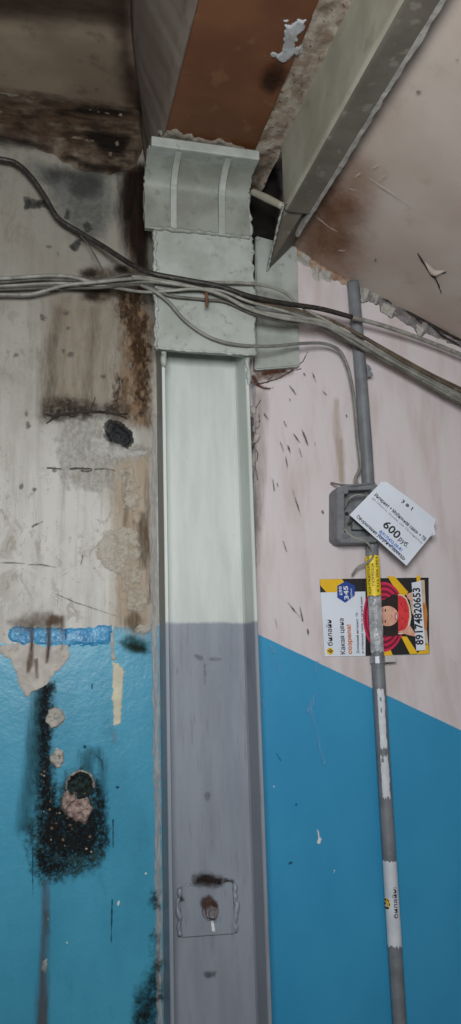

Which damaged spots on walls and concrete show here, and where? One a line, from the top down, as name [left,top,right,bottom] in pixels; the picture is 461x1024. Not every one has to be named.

peeling [271,19,306,63]
water stain [0,135,44,147]
spalling [294,246,350,286]
spalling [360,288,461,348]
rust [81,266,153,427]
peeling [96,527,152,633]
peeling [0,642,70,697]
peeling [110,633,124,726]
peeling [45,707,65,729]
spalling [40,748,94,853]
rust [194,874,233,908]